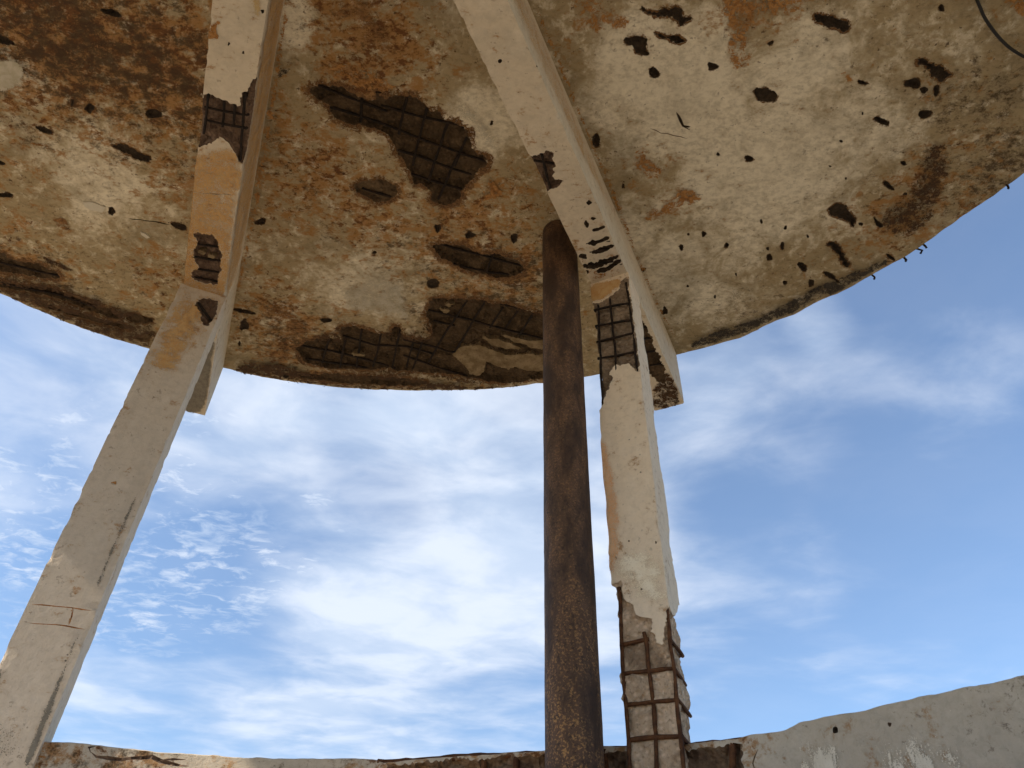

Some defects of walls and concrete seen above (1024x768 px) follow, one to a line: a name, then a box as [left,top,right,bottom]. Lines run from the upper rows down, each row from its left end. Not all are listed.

spalling [198,77,257,163]
spalling [303,76,494,210]
spalling [170,221,223,285]
spalling [427,224,529,282]
spalling [579,200,623,274]
damp [0,276,155,348]
spalling [282,278,543,389]
spalling [593,277,666,405]
crack [32,604,91,629]
spalling [604,580,744,768]
spalling [377,751,545,768]